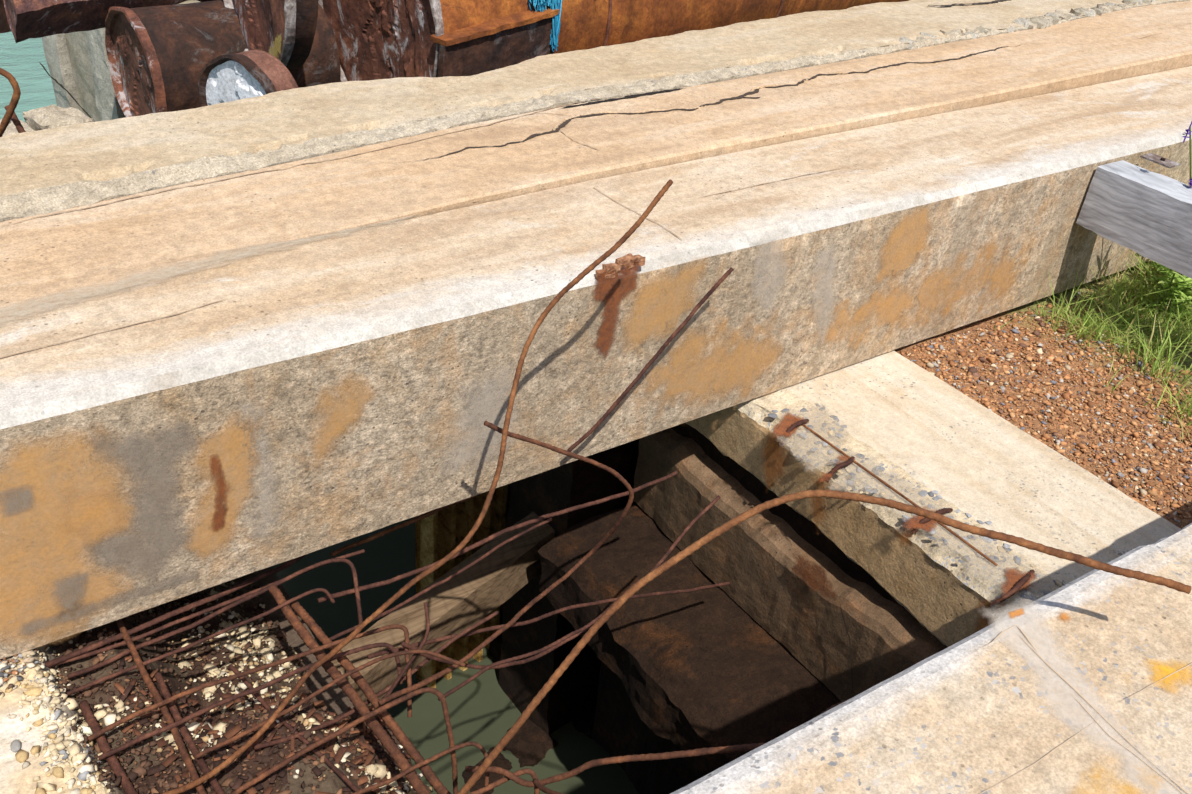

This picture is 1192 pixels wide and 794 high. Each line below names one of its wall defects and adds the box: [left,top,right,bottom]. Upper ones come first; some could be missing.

crack [2,45,1020,226]
corrosion [594,253,646,357]
spalling [45,179,1191,794]
corrosion [792,556,836,599]
corrosion [900,507,943,544]
corrosion [976,569,1036,632]